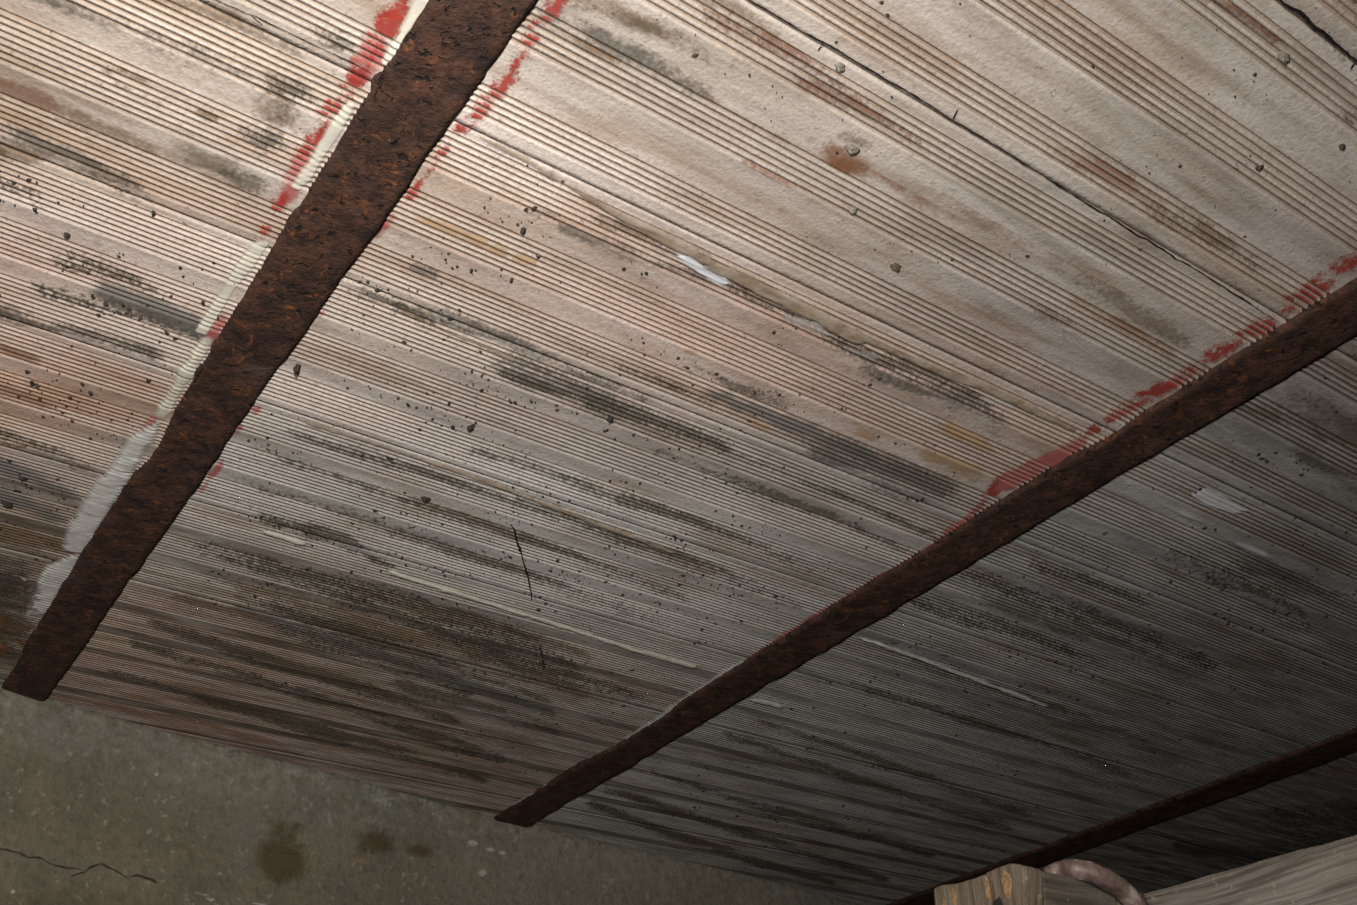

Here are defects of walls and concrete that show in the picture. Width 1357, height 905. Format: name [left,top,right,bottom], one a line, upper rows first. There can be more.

crack [1279,0,1357,69]
crack [749,0,1274,319]
rust [1074,158,1256,267]
rust [1102,289,1177,353]
leakage [17,369,133,448]
leakage [0,427,83,563]
leakage [817,535,1357,788]
leakage [586,720,1039,884]
crack [0,848,157,883]